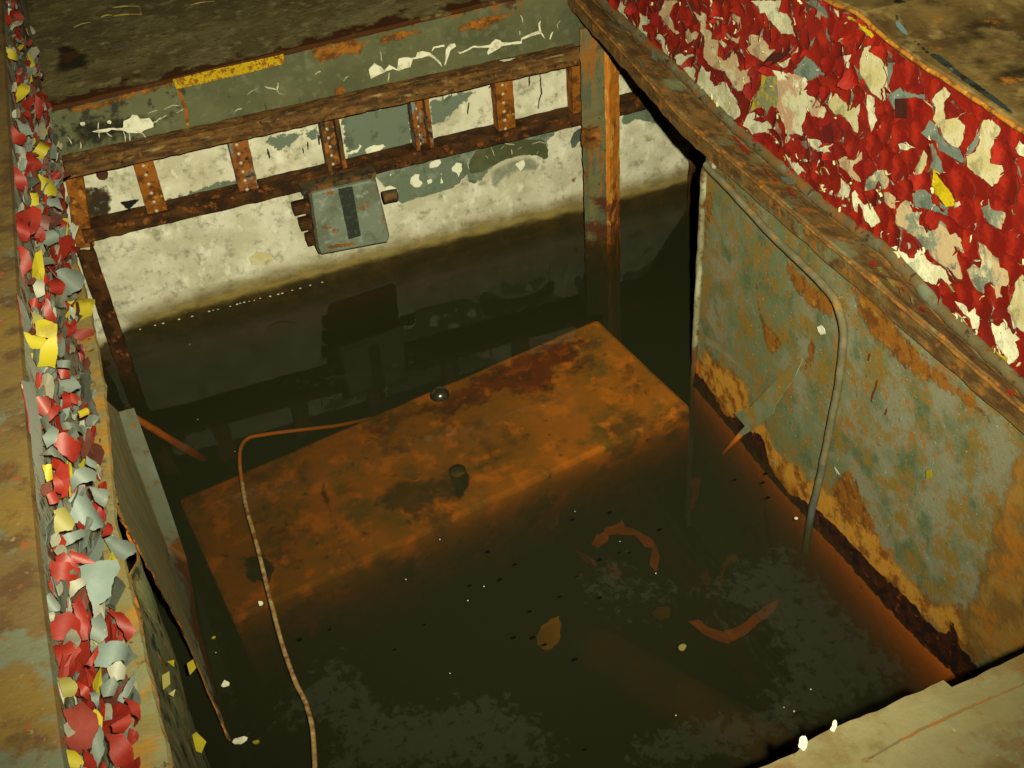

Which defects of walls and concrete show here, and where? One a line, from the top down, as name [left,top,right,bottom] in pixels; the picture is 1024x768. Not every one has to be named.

rust [313,39,363,62]
peeling [80,115,167,142]
rust [72,83,189,127]
peeling [341,103,411,158]
peeling [430,91,476,125]
peeling [376,131,557,203]
peeling [604,0,1024,378]
rust [705,192,713,245]
rust [787,262,833,317]
rust [852,286,989,418]
peeling [5,0,141,768]
rust [693,338,1024,681]